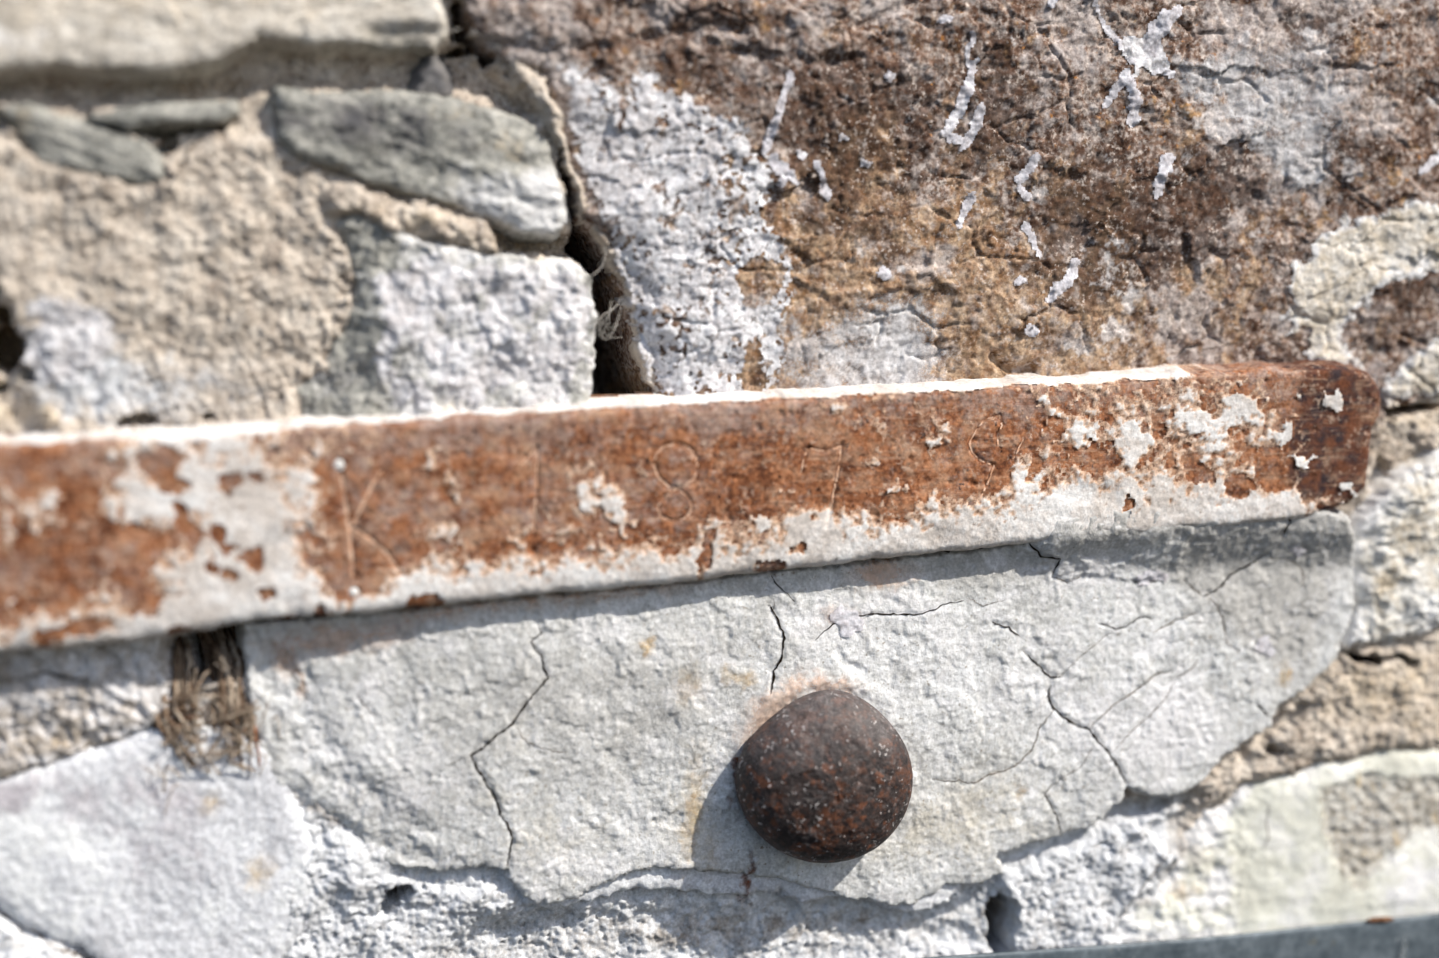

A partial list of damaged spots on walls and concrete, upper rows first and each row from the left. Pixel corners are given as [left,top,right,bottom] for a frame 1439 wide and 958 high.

crack [248,615,318,623]
crack [446,595,567,866]
corrosion [755,687,795,728]
crack [766,519,1304,836]